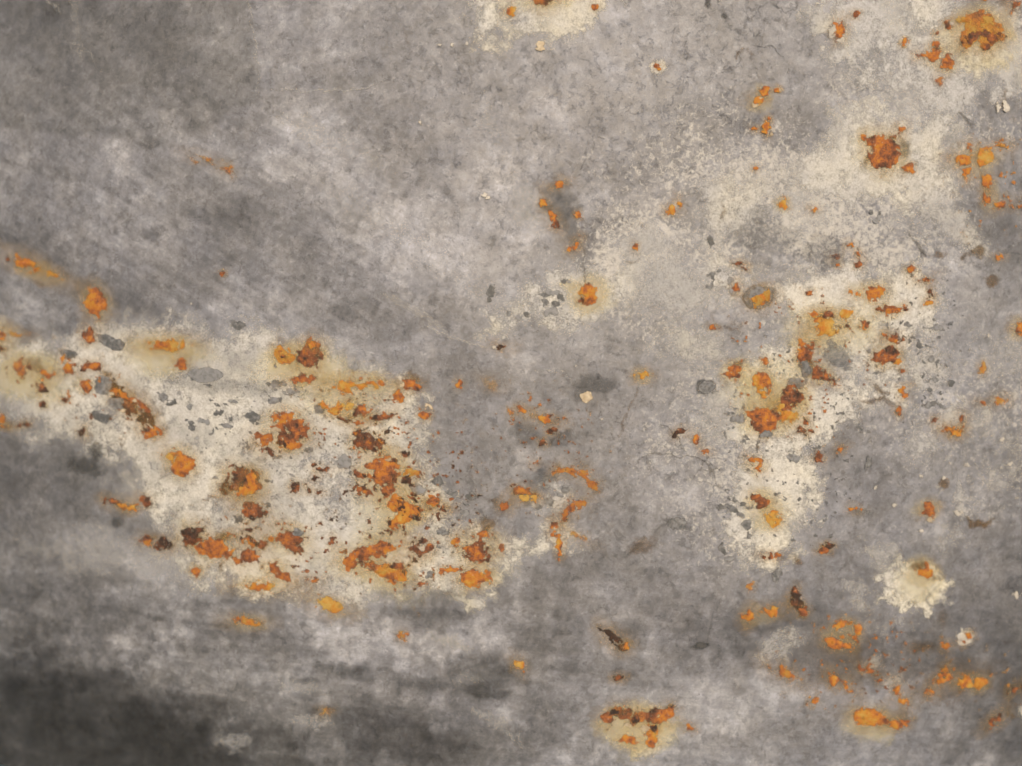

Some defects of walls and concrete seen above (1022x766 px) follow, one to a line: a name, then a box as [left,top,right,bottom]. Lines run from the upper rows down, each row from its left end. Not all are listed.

rust [898,0,1008,86]
rust [861,127,916,174]
rust [274,336,324,384]
rust [873,332,905,373]
rust [13,354,165,439]
rust [723,357,814,437]
water stain [71,448,101,476]
rust [219,464,268,521]
rust [318,377,447,585]
rust [138,522,305,594]
rust [439,530,505,588]
rust [600,704,675,749]